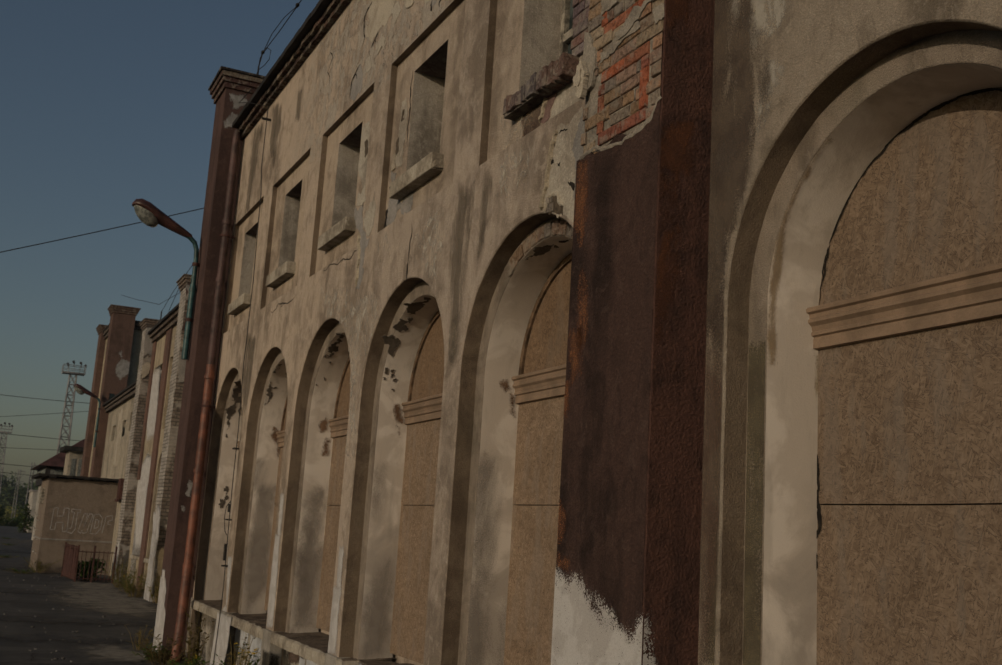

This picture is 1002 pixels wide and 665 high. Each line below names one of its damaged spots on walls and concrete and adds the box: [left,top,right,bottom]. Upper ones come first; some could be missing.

flaking render [366,0,441,55]
flaking render [504,0,664,277]
rust [573,160,588,245]
flaking render [323,333,345,364]
flaking render [382,297,431,356]
flaking render [225,381,241,438]
crack [815,456,823,570]
peeling [551,567,656,665]